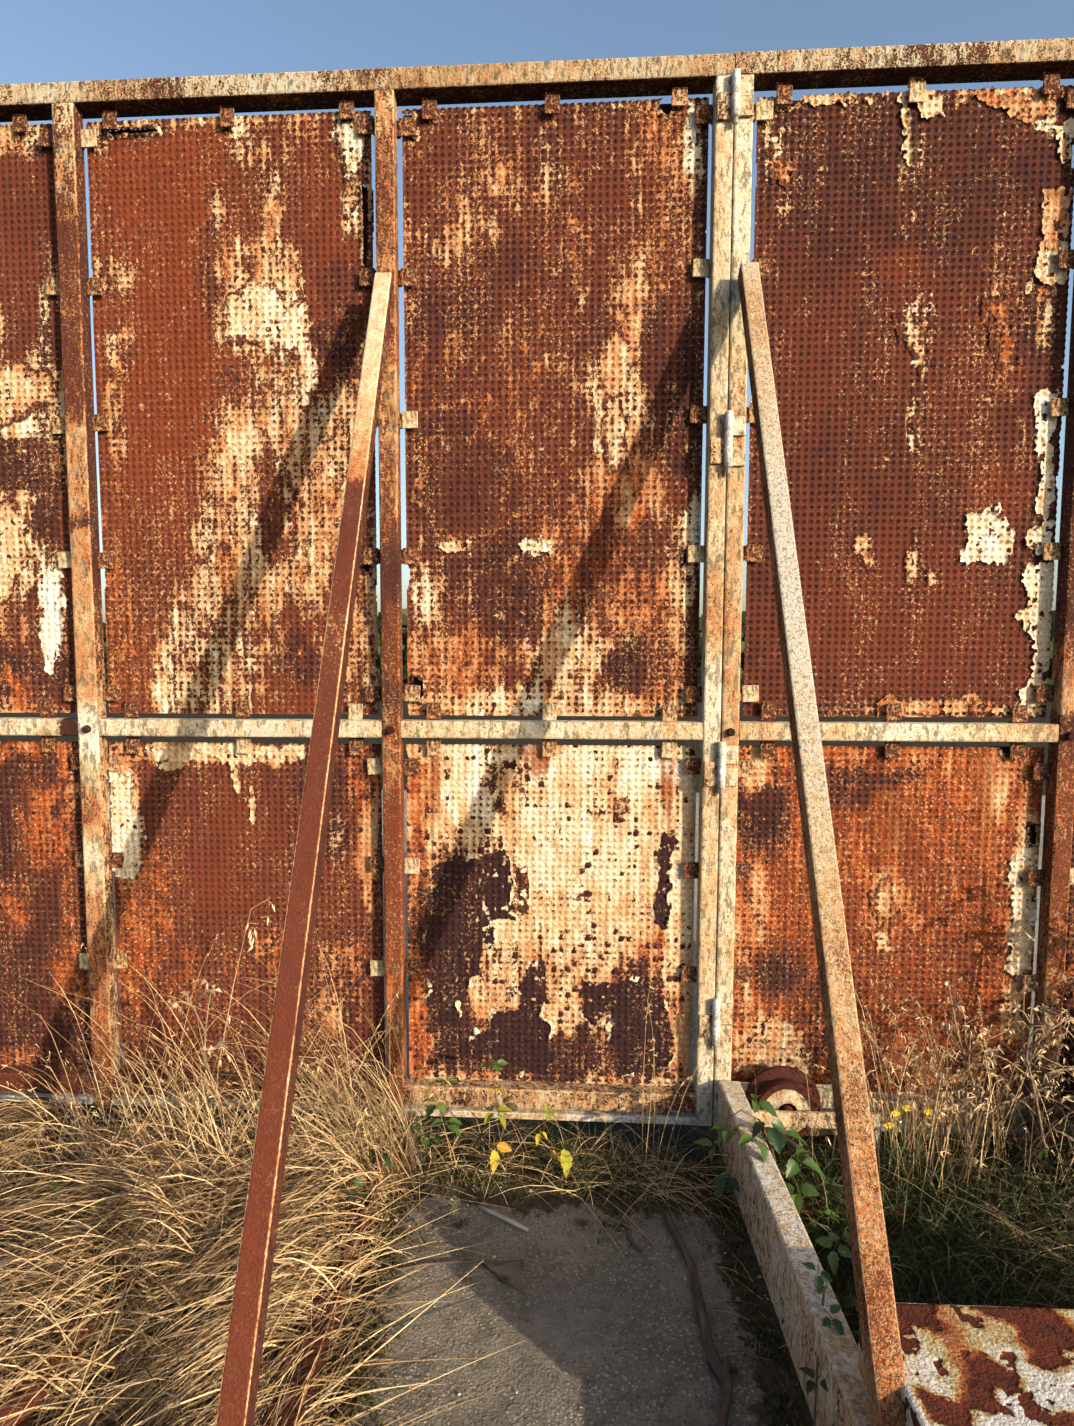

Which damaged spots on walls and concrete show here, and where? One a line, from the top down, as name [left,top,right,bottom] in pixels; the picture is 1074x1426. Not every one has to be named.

peeling [219,279,324,413]
rust [0,442,54,547]
rust [410,434,525,540]
rust [196,541,232,557]
rust [471,543,555,630]
peeling [849,530,882,572]
peeling [899,527,940,596]
peeling [960,388,1061,717]
rust [0,673,13,710]
rust [55,643,70,690]
peeling [877,693,968,718]
rust [740,783,792,845]